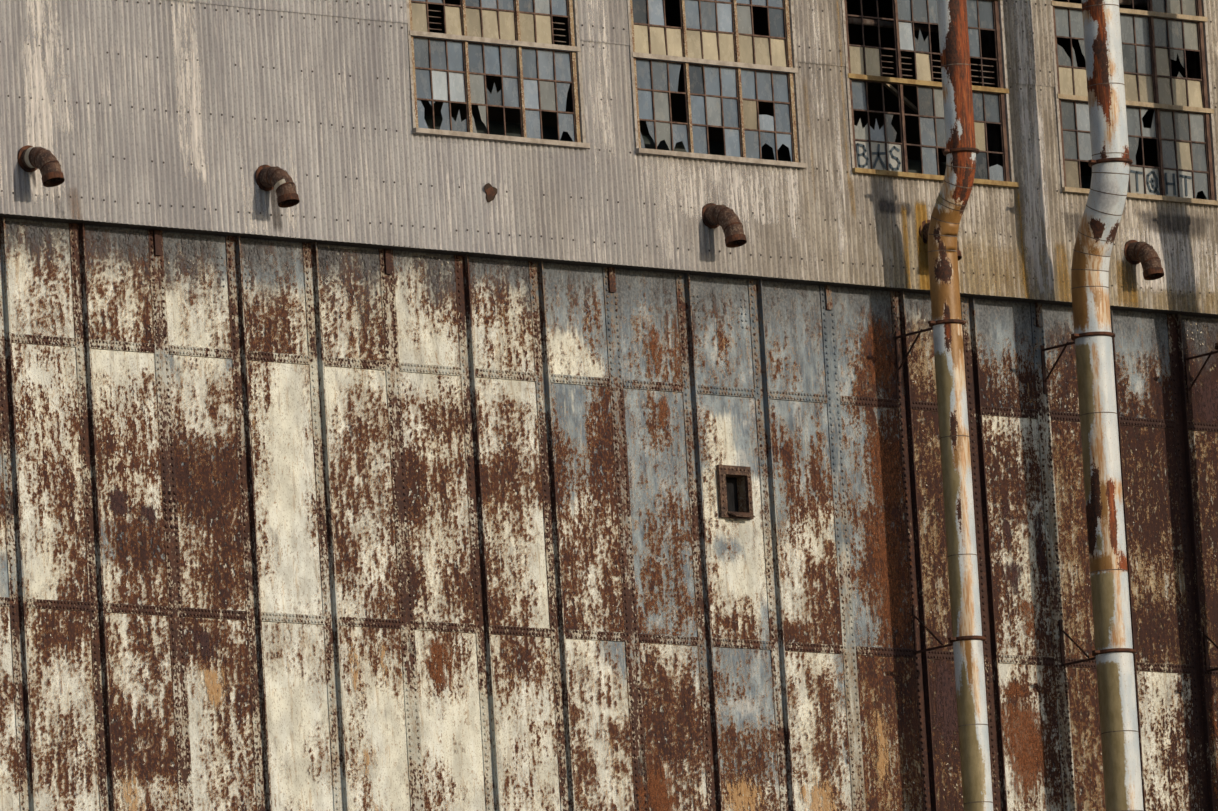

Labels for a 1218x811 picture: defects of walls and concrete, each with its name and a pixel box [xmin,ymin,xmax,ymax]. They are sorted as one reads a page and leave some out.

corrosion [0,607,20,795]
corrosion [5,201,964,811]
corrosion [1116,316,1218,811]